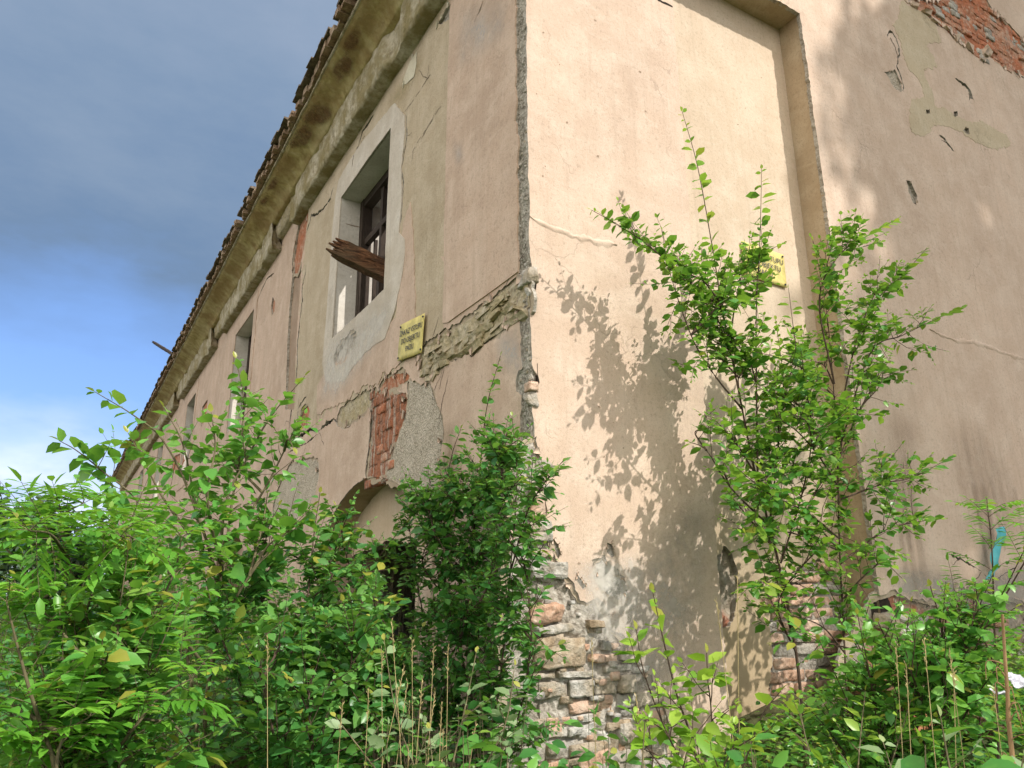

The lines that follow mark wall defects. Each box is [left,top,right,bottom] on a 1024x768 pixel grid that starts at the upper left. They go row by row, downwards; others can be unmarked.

peeling [886,0,1024,151]
flaking render [292,214,308,278]
flaking render [335,0,682,768]